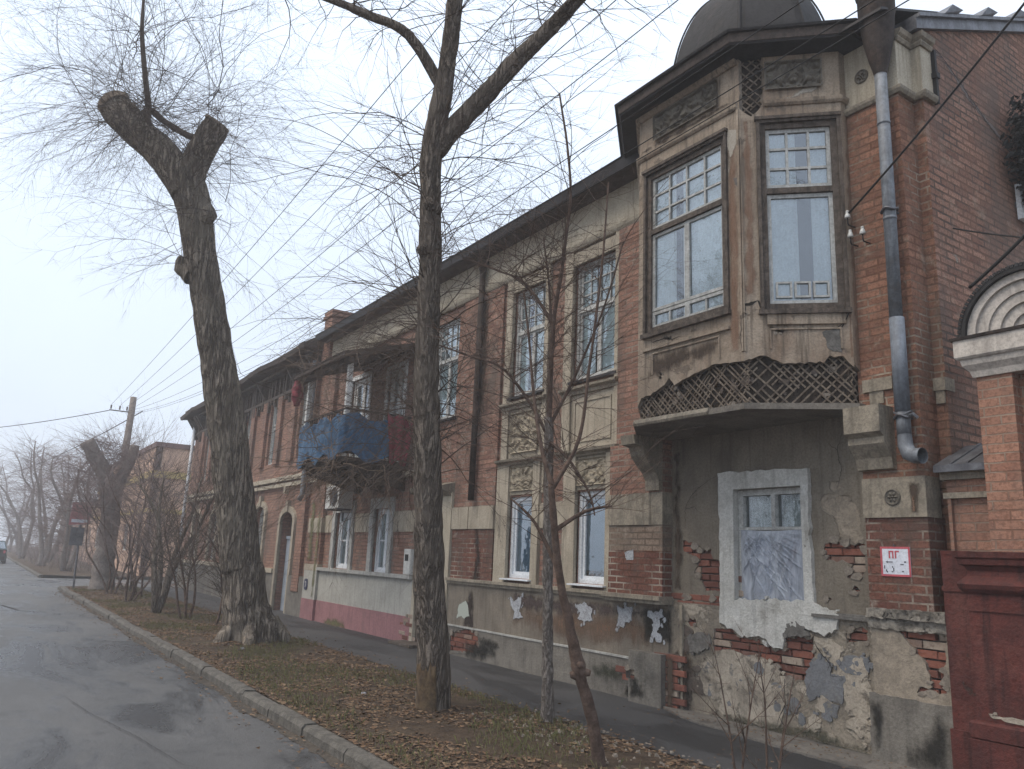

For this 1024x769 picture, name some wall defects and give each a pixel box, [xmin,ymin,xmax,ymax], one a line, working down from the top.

spalling [820,489,867,596]
spalling [654,540,843,710]
spalling [847,626,873,679]
spalling [900,631,951,698]